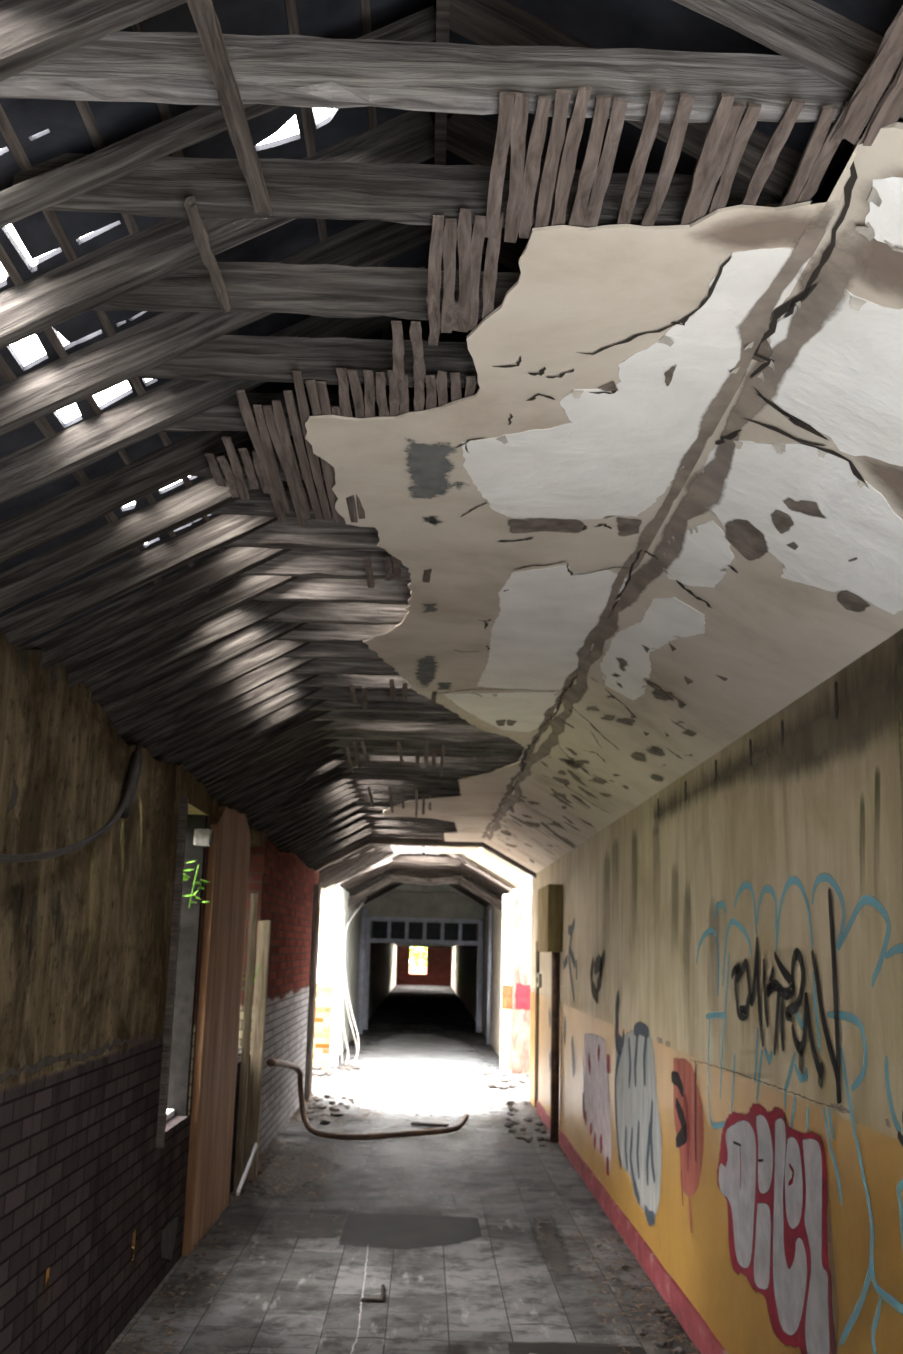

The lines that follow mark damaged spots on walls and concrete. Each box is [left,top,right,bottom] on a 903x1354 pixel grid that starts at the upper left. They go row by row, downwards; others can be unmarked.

peeling [855,176,903,253]
crack [437,676,637,840]
spalling [499,748,629,863]
peeling [443,565,705,782]
crack [455,537,713,652]
crack [455,256,732,453]
peeling [462,247,903,615]
leakage [482,217,903,840]
crack [715,161,868,487]
leakage [860,770,880,862]